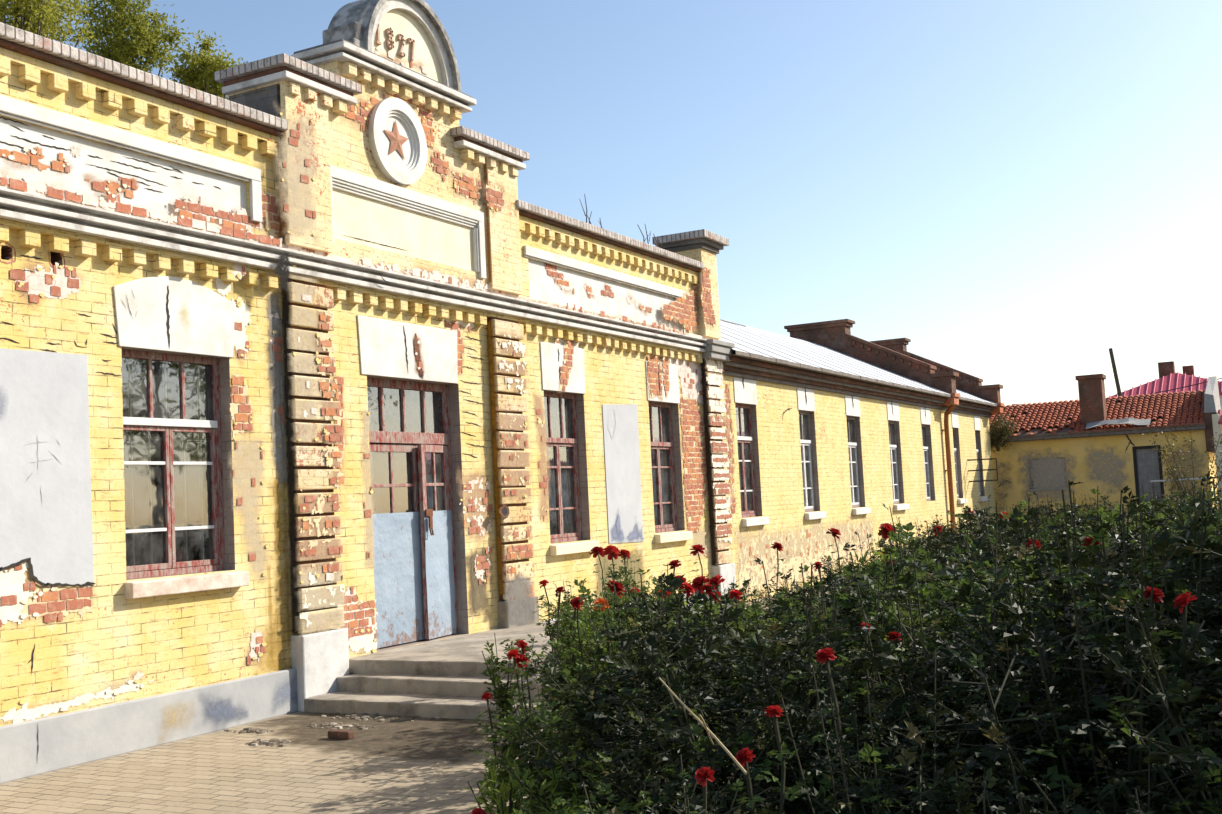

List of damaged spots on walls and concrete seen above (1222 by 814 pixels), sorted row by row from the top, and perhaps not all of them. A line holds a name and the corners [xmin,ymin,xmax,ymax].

spalling [341,92,505,213]
crack [0,292,137,376]
crack [164,287,172,349]
flaking render [0,112,378,653]
spalling [359,257,717,340]
spalling [459,334,549,600]
spalling [647,354,873,596]